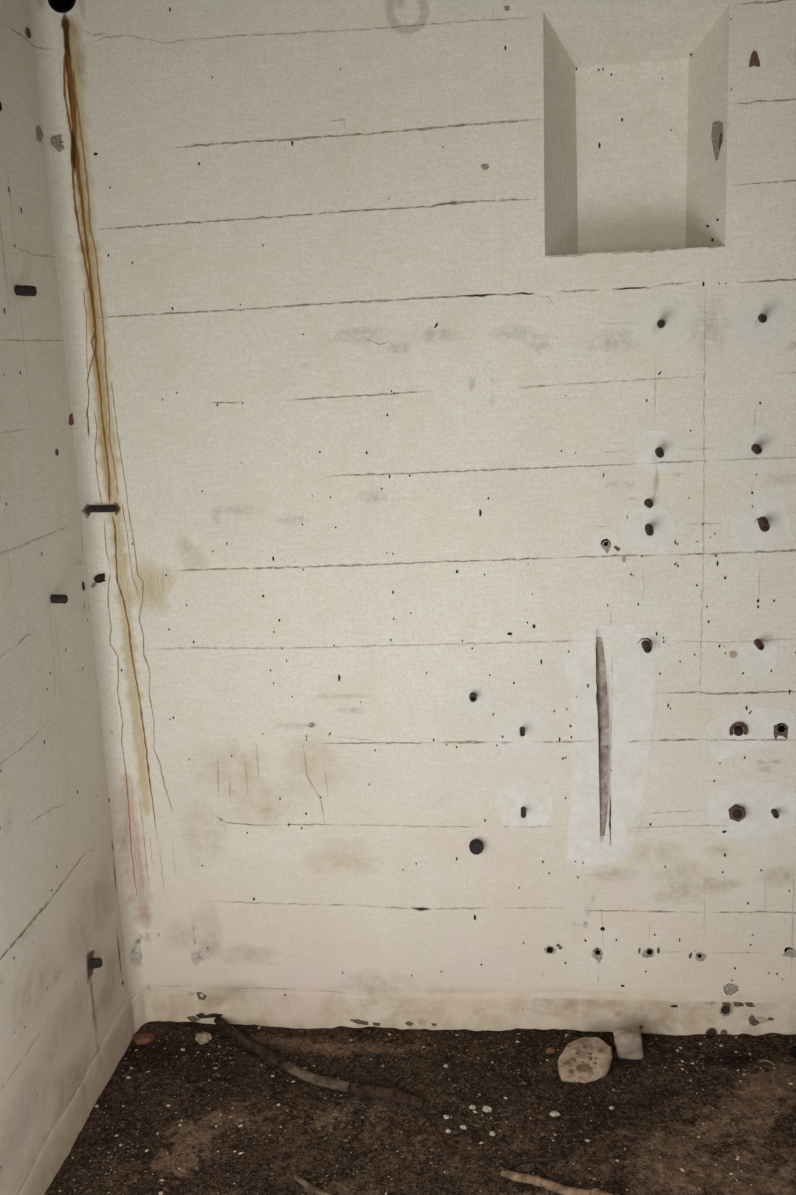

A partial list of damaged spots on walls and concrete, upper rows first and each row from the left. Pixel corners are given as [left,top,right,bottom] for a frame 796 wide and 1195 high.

rust [62,16,172,888]